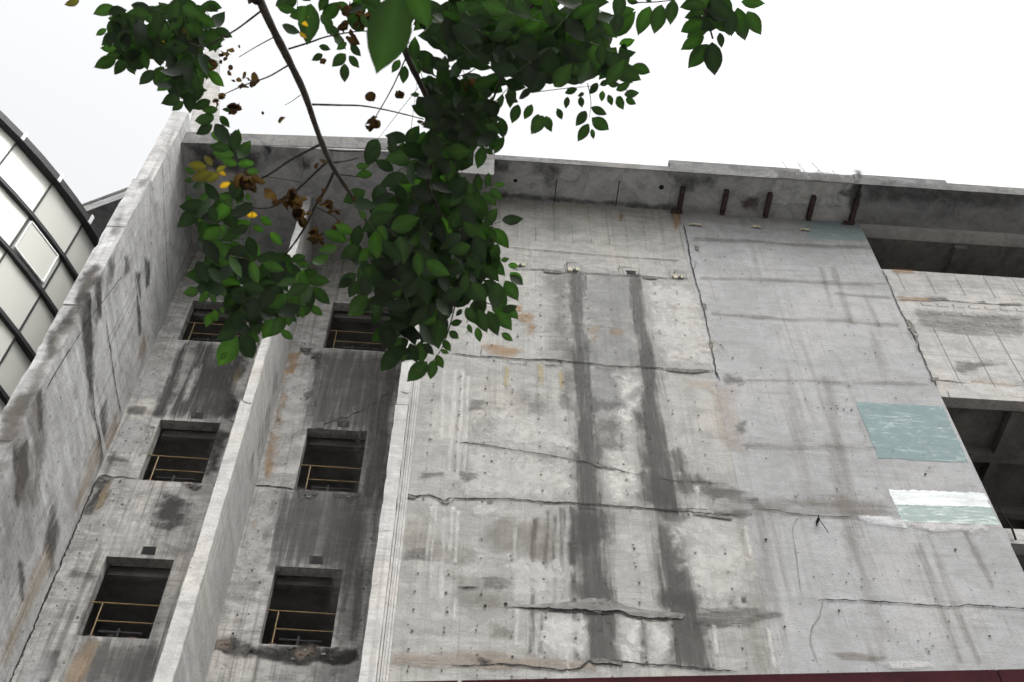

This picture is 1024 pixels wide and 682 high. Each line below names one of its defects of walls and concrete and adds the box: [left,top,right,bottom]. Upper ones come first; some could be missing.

damp [0,265,101,505]
damp [46,510,58,563]
damp [97,401,128,466]
damp [85,481,185,555]
damp [392,272,621,669]
crack [452,226,720,386]
damp [630,274,780,668]
crack [408,494,1024,664]
crack [882,269,1022,406]
spalling [214,638,359,665]
crack [453,658,736,672]